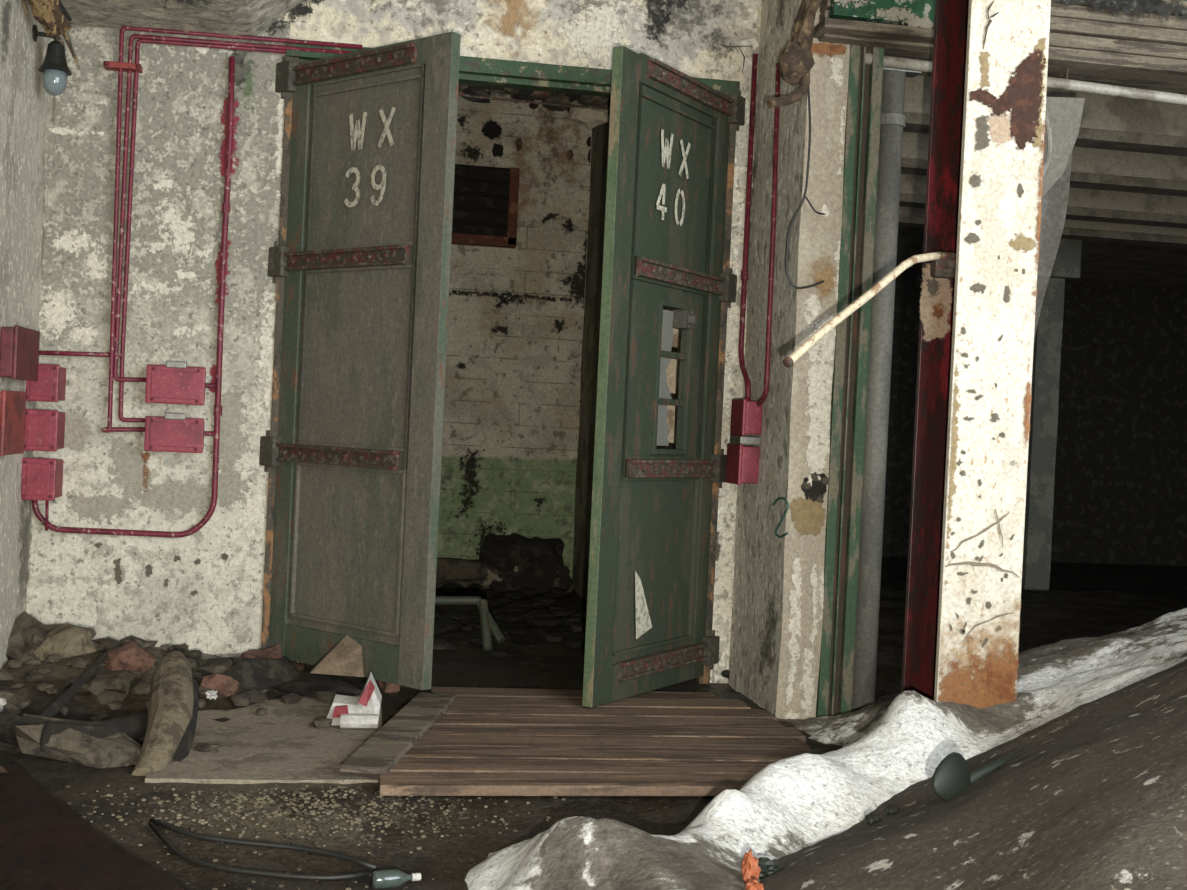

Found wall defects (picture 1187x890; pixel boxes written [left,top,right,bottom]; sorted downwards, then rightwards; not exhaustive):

peeling [832,0,934,28]
leakage [639,0,733,72]
peeling [975,114,991,150]
rust [969,38,1047,270]
peeling [969,174,982,187]
peeling [965,219,982,245]
peeling [998,233,1038,259]
rust [1023,383,1032,442]
rust [938,623,1019,708]